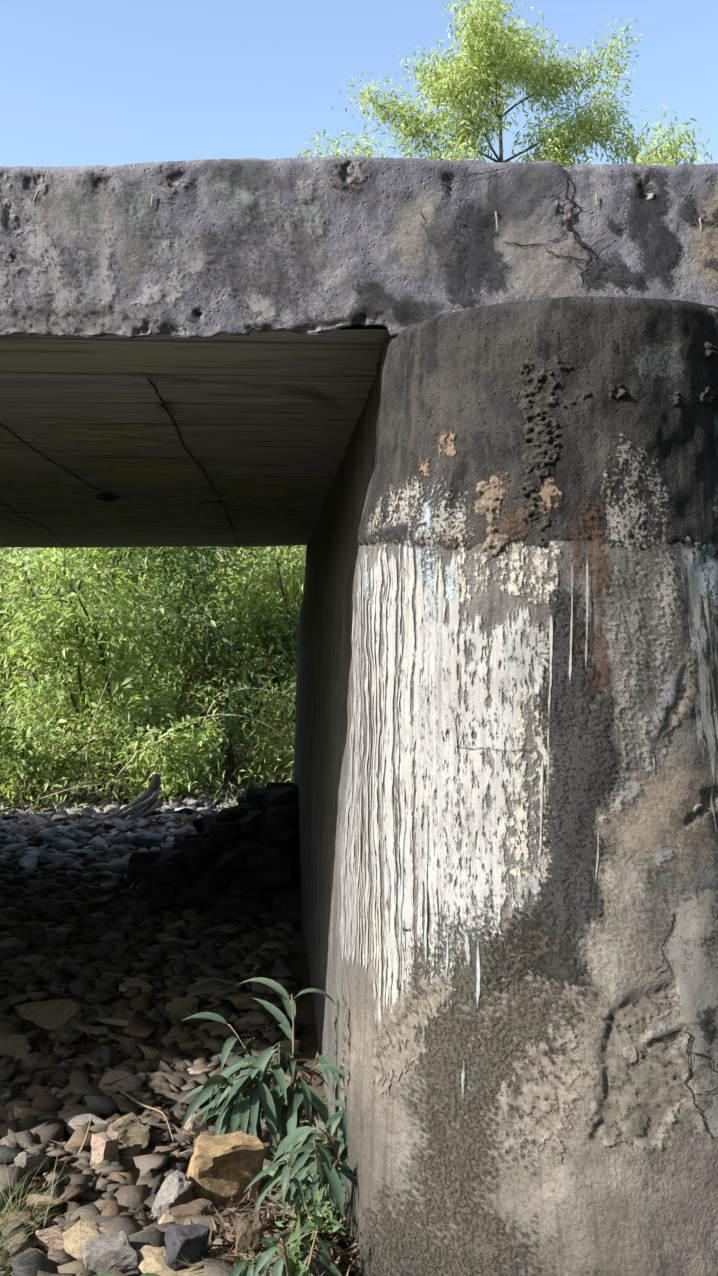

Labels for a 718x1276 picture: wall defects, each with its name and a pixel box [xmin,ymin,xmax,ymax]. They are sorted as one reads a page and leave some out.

water stain [348,162,567,324]
crack [504,160,604,287]
water stain [585,166,718,292]
crack [0,423,109,499]
crack [148,377,240,550]
water stain [337,470,474,875]
corrosion [564,500,610,698]
water stain [359,433,718,1276]
crack [653,911,676,979]
crack [656,1029,718,1141]